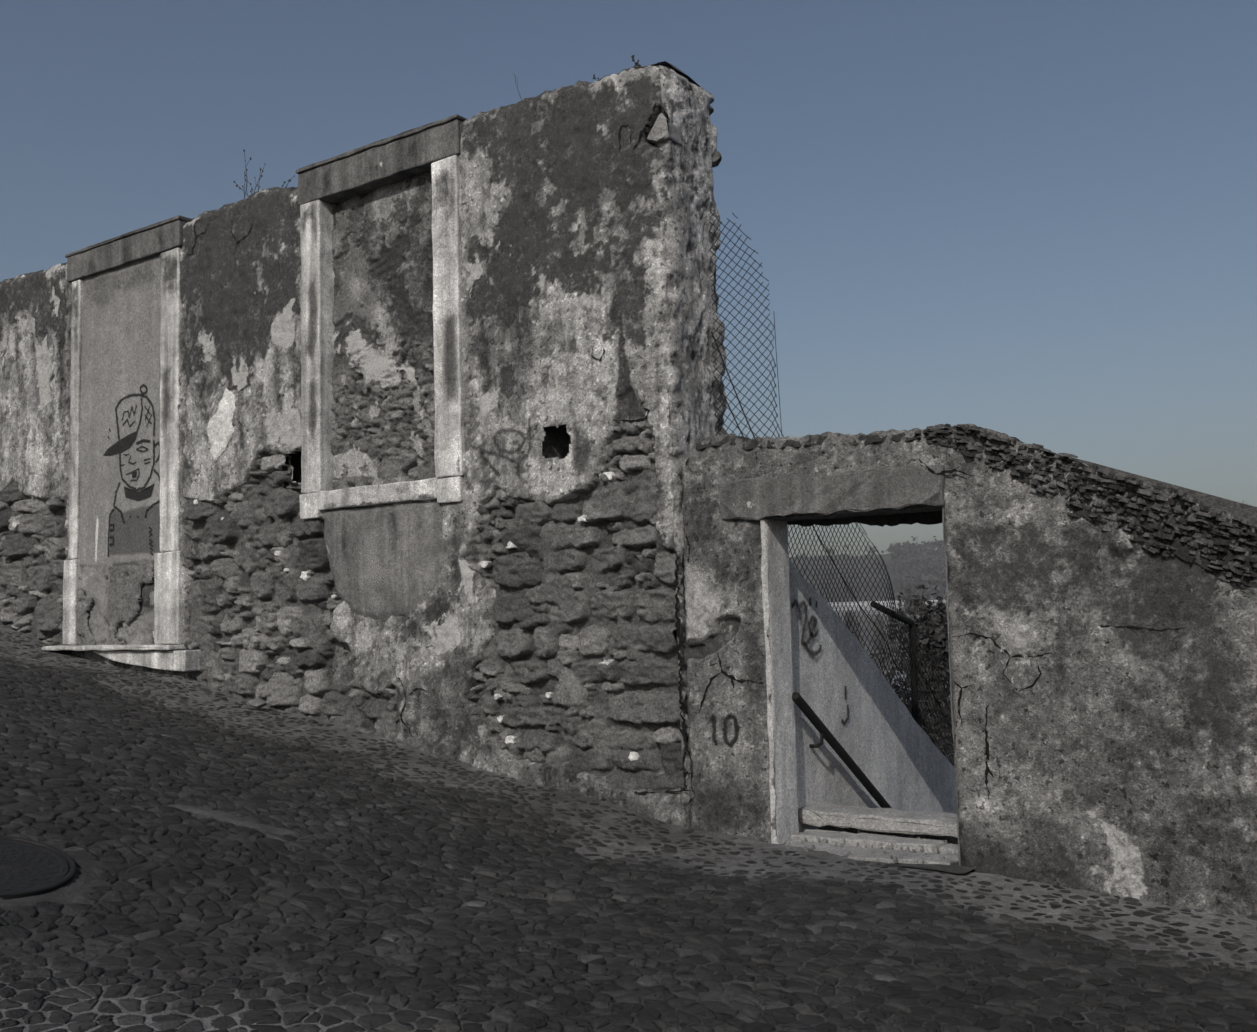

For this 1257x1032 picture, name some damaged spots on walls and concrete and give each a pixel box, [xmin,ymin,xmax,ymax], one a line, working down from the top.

damp [0,268,77,423]
flaking render [207,388,236,461]
damp [165,189,314,451]
damp [460,74,677,420]
spalling [0,480,155,652]
spalling [182,448,397,738]
spalling [465,421,741,794]
crack [635,526,764,804]
crack [951,676,993,800]
crack [953,632,1053,691]